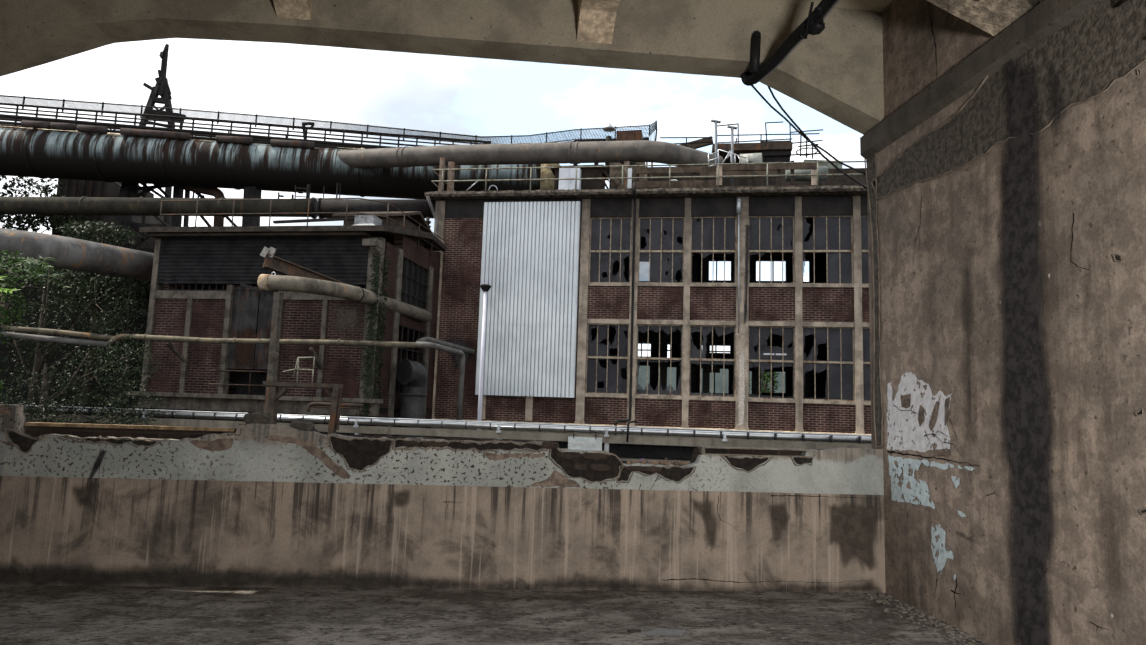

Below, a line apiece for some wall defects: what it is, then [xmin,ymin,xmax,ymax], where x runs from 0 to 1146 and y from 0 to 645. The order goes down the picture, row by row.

spalling [265,435,697,487]
spalling [720,454,772,473]
damp [394,492,409,506]
damp [694,501,716,545]
damp [771,505,788,538]
peeling [931,524,956,580]